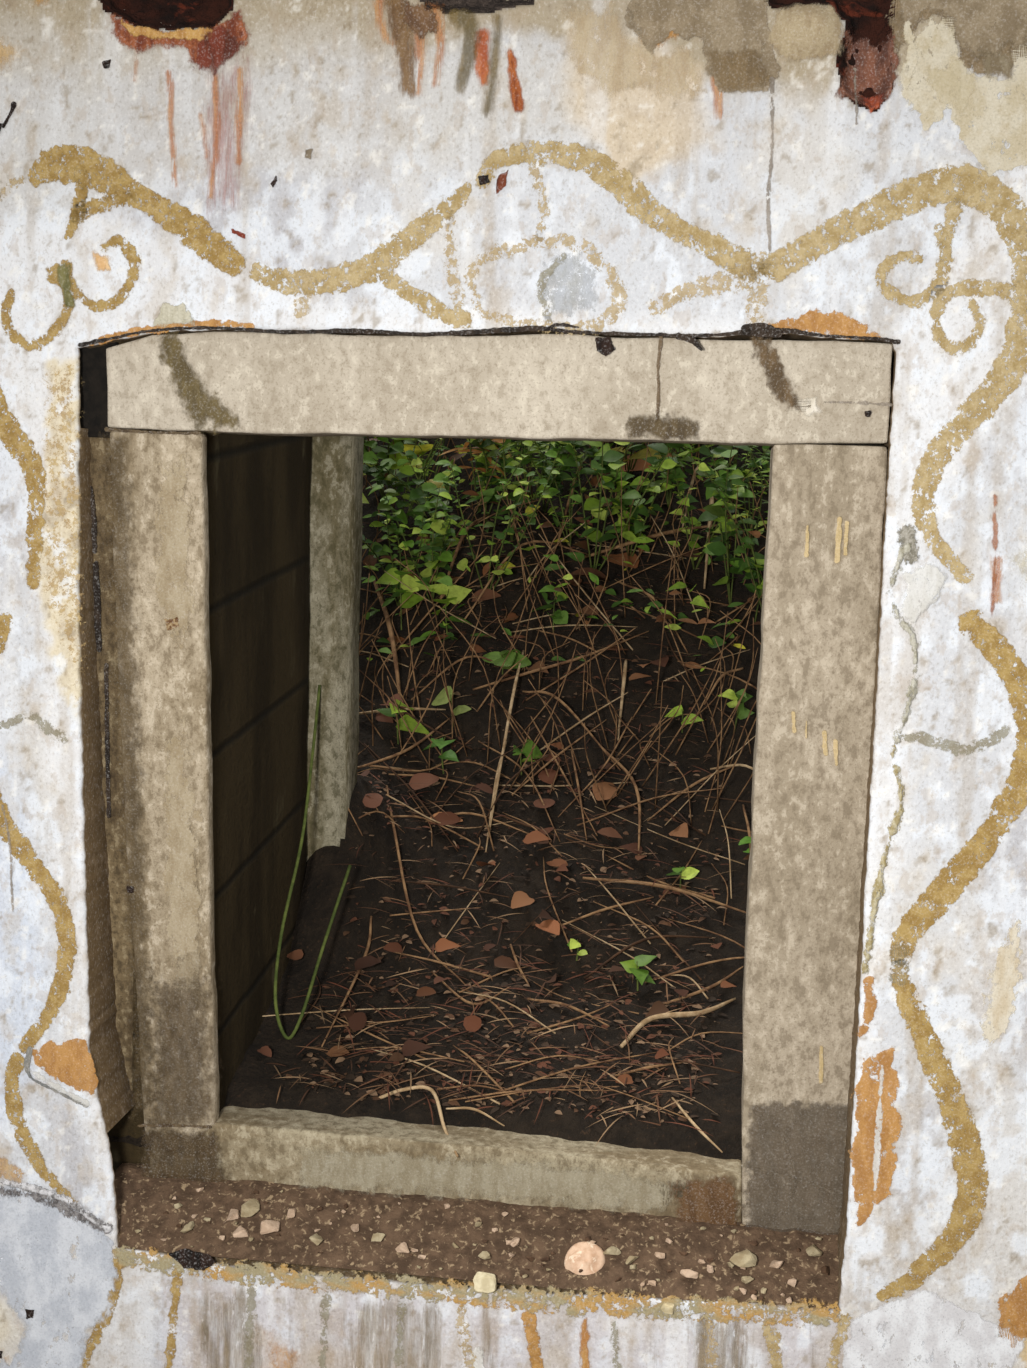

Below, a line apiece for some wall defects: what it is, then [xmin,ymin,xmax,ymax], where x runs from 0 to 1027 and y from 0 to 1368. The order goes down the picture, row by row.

corrosion [167,71,177,181]
spalling [98,0,248,75]
corrosion [206,69,247,201]
corrosion [375,0,523,113]
flaking render [625,0,1027,177]
flaking render [32,1038,98,1107]
flaking render [0,1158,117,1368]
flaking render [842,1276,1027,1368]